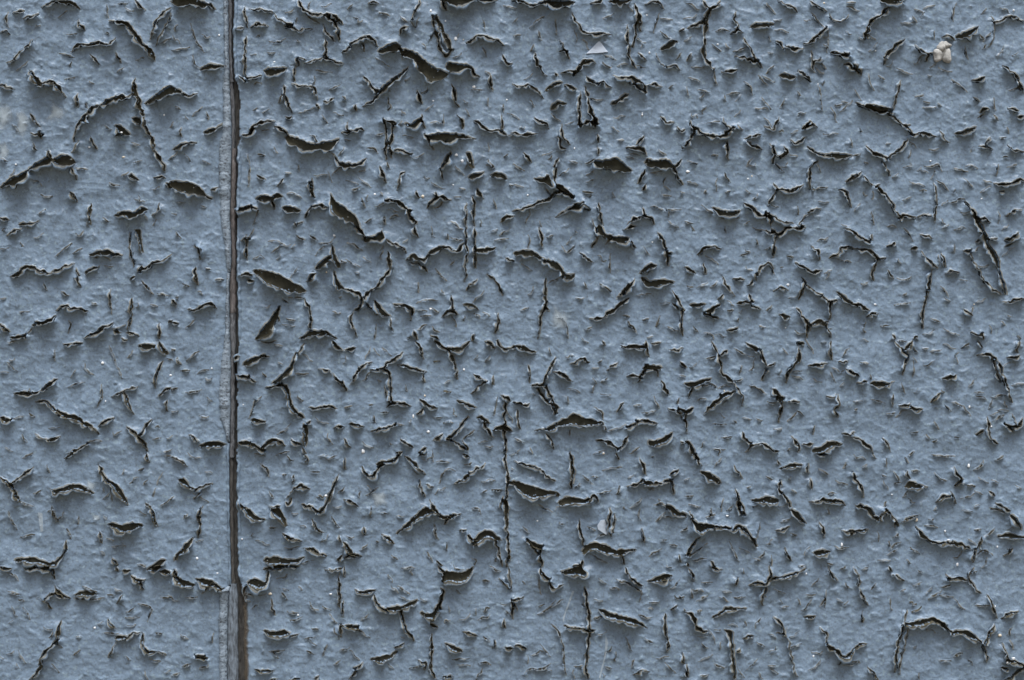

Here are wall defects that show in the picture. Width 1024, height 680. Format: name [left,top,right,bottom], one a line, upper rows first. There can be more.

peeling [362,41,480,107]
peeling [0,150,79,191]
peeling [274,125,367,173]
peeling [403,113,509,182]
peeling [585,145,685,192]
peeling [255,192,386,245]
peeling [241,244,345,367]
peeling [146,536,224,593]
peeling [242,554,305,603]
peeling [395,499,504,567]
peeling [511,451,637,581]
peeling [354,565,474,666]